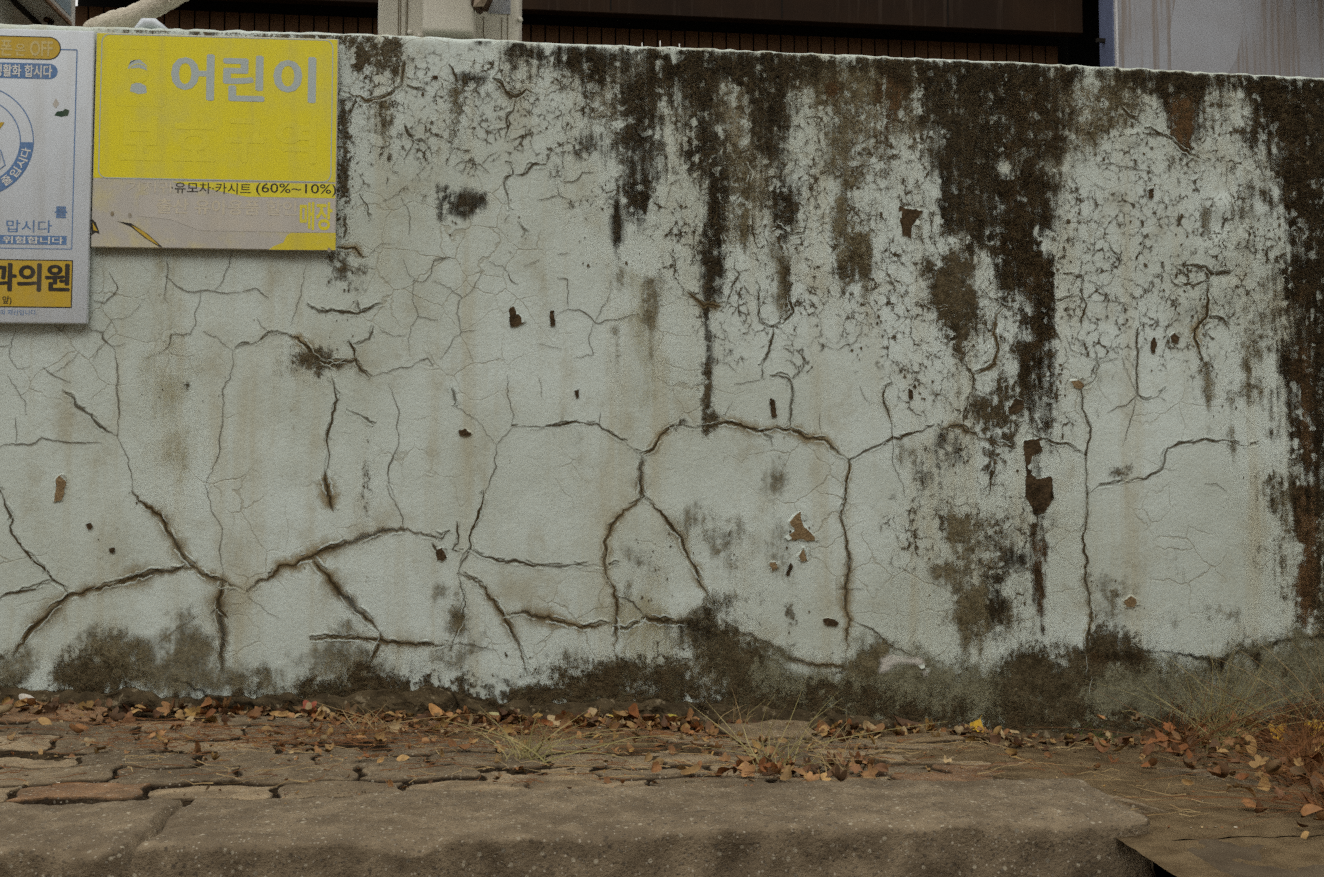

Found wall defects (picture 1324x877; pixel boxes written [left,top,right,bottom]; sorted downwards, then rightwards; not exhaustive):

water stain [425,185,487,220]
peeling [898,206,924,241]
peeling [1102,112,1211,343]
crack [0,35,1324,711]
water stain [507,0,1324,659]
peeling [894,365,1064,520]
peeling [52,472,80,517]
peeling [768,511,819,576]
water stain [0,611,395,704]
water stain [430,584,481,670]
peeling [808,611,839,627]
water stain [546,573,1184,728]